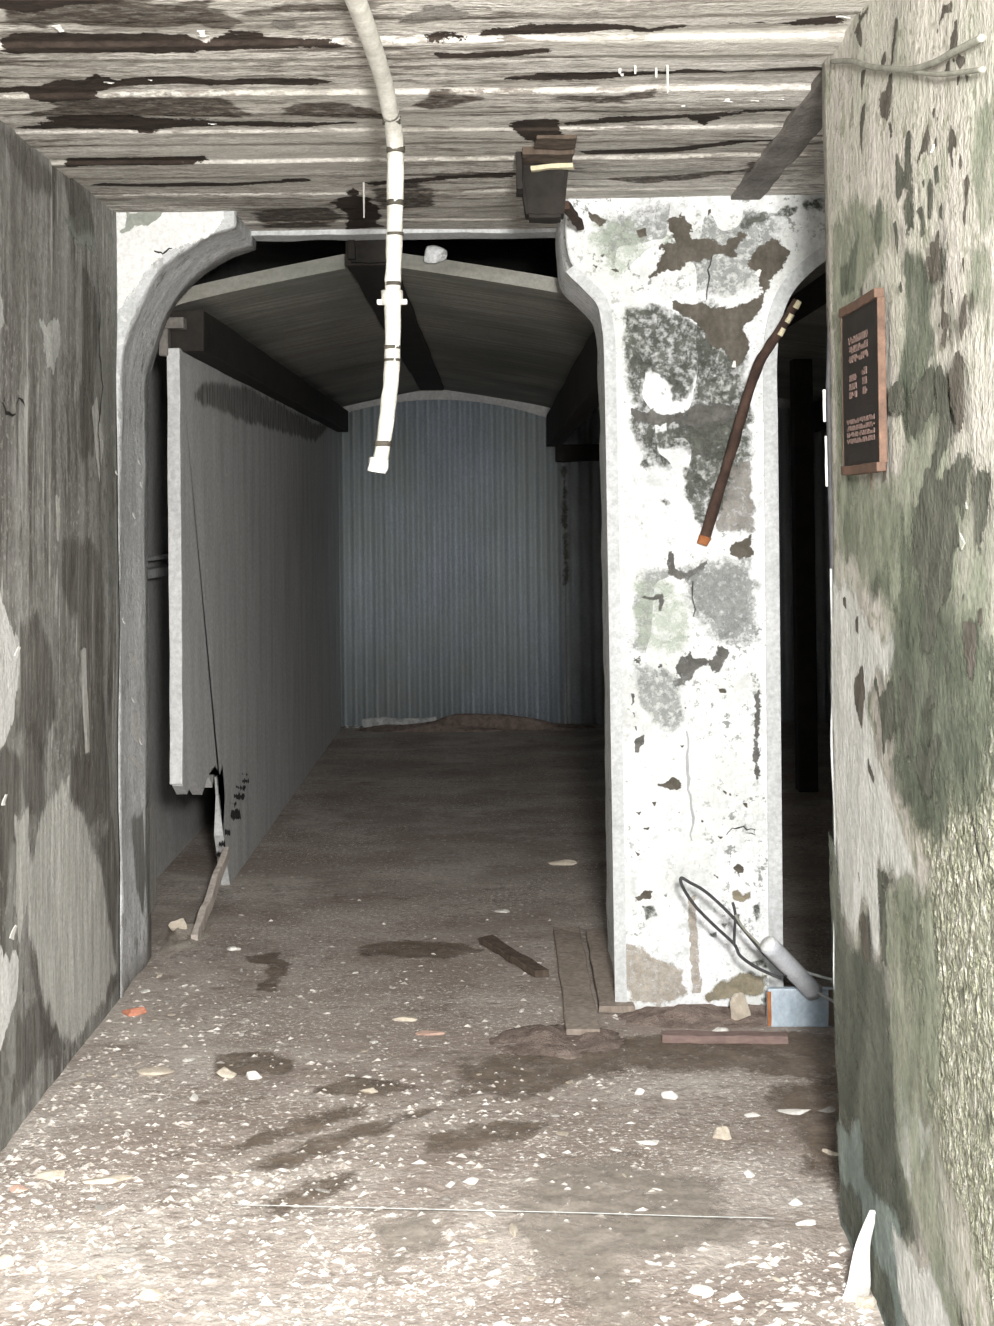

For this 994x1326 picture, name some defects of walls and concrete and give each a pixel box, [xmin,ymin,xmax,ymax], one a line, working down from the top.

spalling [0,0,349,54]
spalling [0,74,382,133]
spalling [64,156,208,167]
spalling [330,181,387,230]
water stain [80,267,103,482]
peeling [860,18,991,682]
spalling [667,551,707,580]
water stain [0,494,118,1101]
water stain [133,804,157,919]
water stain [454,583,951,1326]
water stain [237,1077,432,1170]
water stain [427,1121,548,1151]